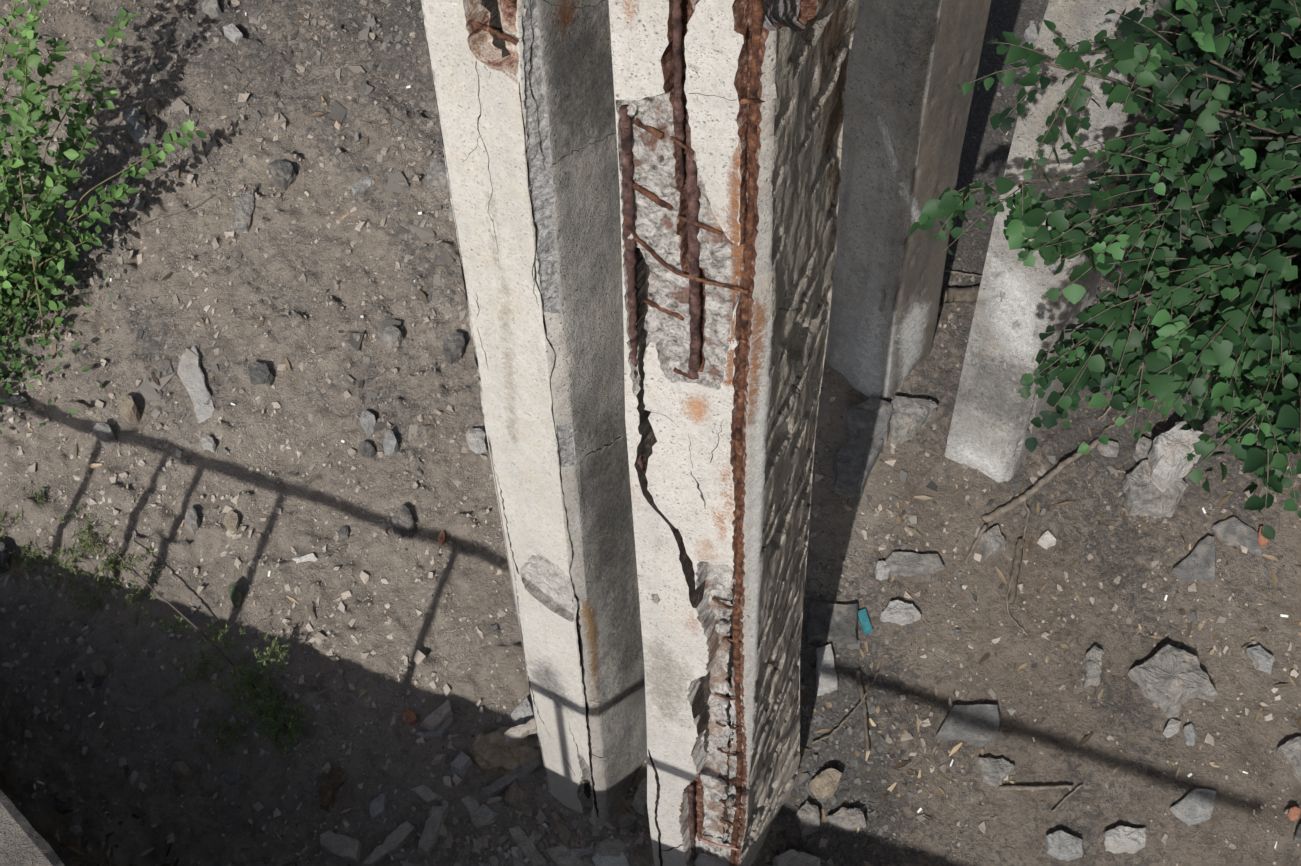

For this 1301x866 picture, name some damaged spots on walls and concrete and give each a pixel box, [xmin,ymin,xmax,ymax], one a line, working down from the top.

crack [463,61,499,262]
spalling [451,0,561,314]
crack [475,293,488,367]
crack [494,464,520,575]
crack [519,0,724,817]
spalling [615,0,817,866]
rust [724,141,745,385]
rust [748,305,765,424]
crack [648,749,683,866]